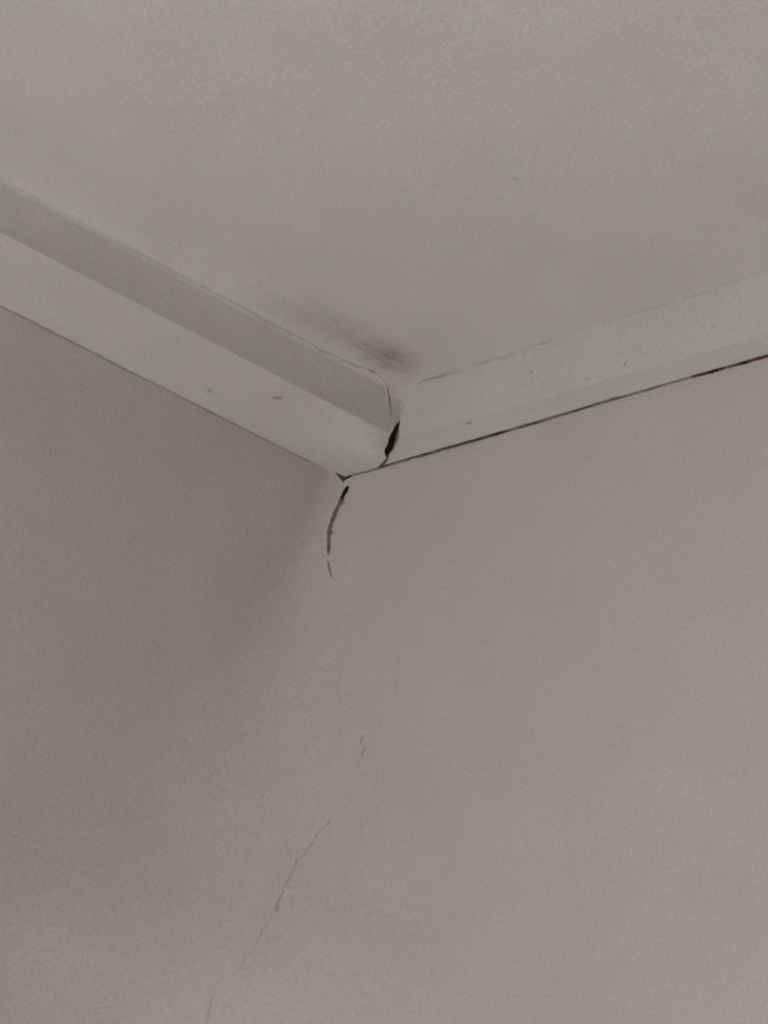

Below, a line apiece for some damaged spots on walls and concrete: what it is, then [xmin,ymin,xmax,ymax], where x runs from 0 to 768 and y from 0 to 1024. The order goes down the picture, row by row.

crack [327,355,768,572]